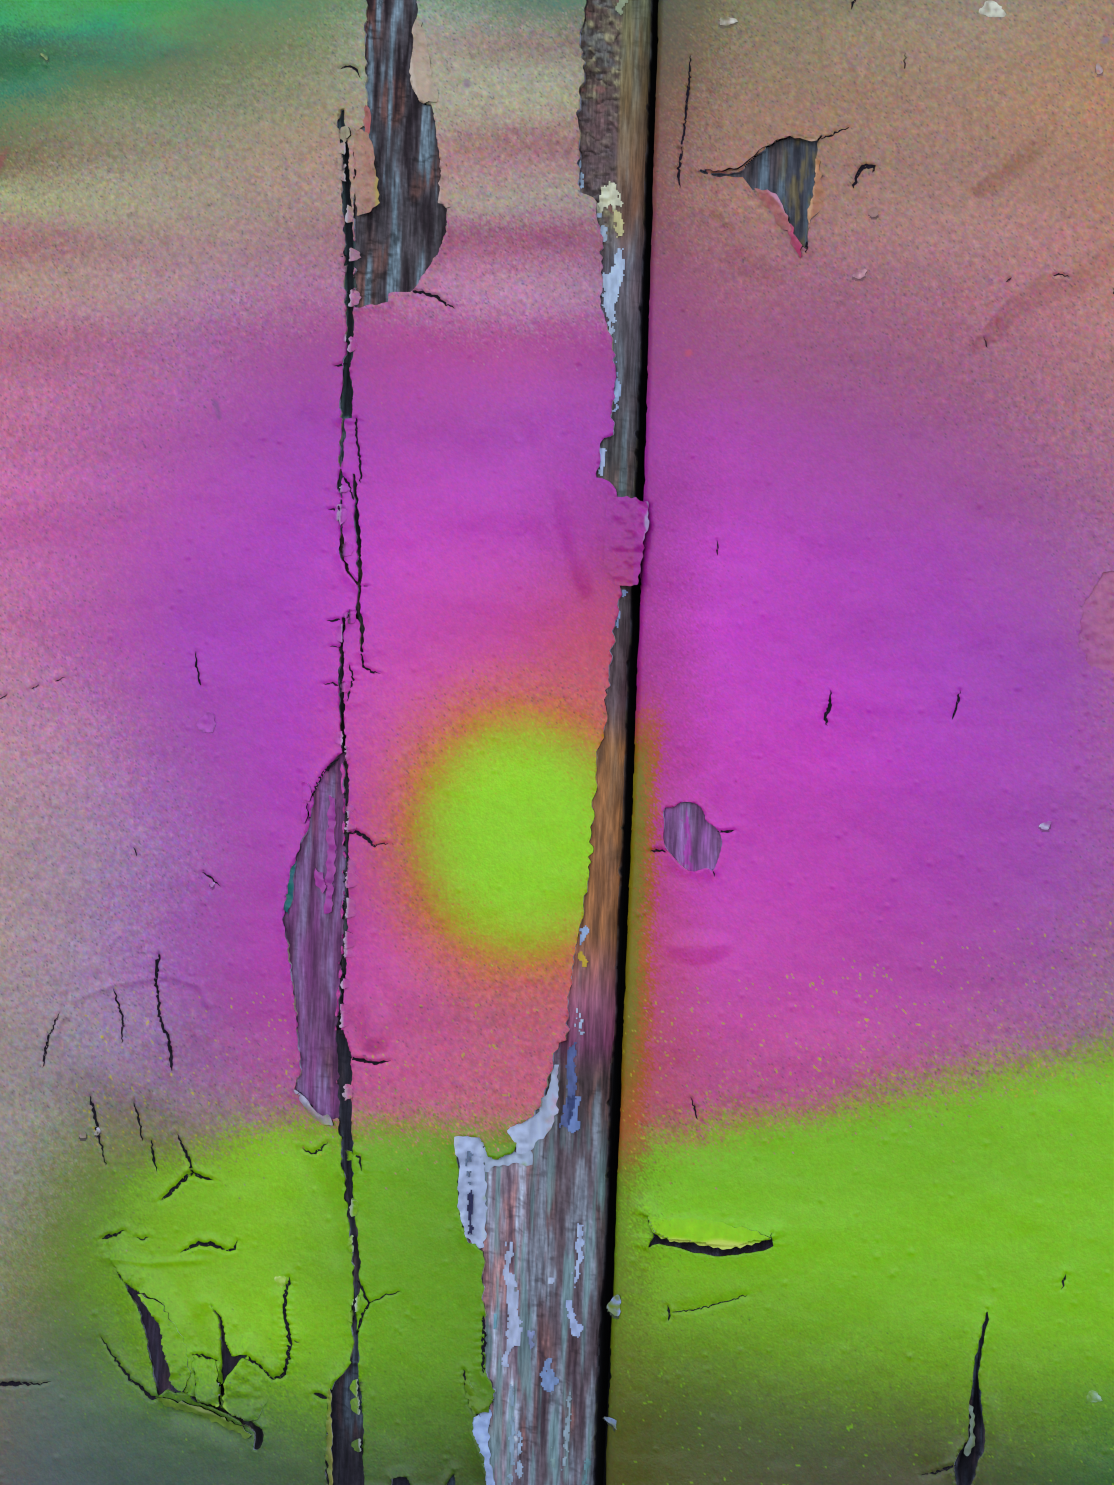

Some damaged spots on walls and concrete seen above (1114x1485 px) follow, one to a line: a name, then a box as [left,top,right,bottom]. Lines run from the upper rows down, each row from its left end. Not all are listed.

peeling [339,0,454,308]
peeling [700,127,849,258]
crack [314,110,400,1485]
peeling [454,0,654,1485]
peeling [651,802,734,876]
crack [42,1014,59,1068]
crack [113,954,173,1070]
peeling [284,753,346,1154]
crack [90,1096,107,1164]
crack [134,1104,212,1200]
peeling [100,1276,298,1450]
crack [922,1312,989,1485]